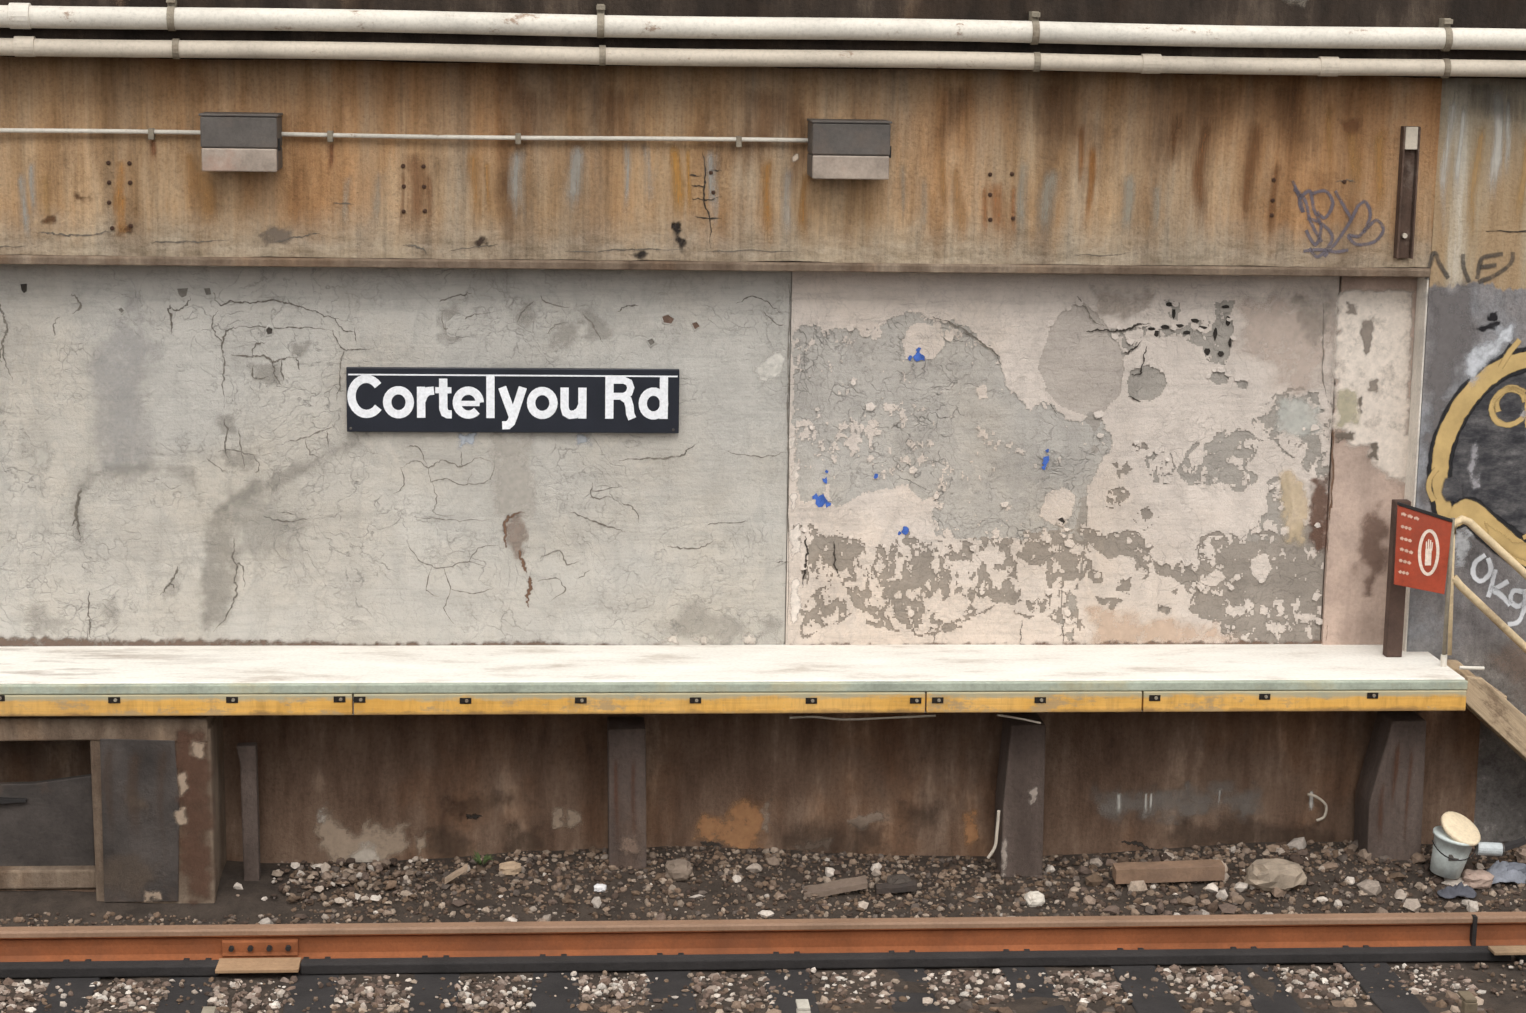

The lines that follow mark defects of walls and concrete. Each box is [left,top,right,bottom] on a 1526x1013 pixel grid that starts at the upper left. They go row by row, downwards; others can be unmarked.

crack [565,154,793,252]
rust [1079,130,1095,207]
rust [1194,126,1210,207]
rust [1243,129,1259,209]
crack [167,293,372,473]
crack [72,490,82,538]
crack [396,445,590,624]
crack [571,446,694,532]
crack [730,290,838,644]
peeling [755,284,1500,644]
rust [552,808,581,828]
rust [696,799,765,849]